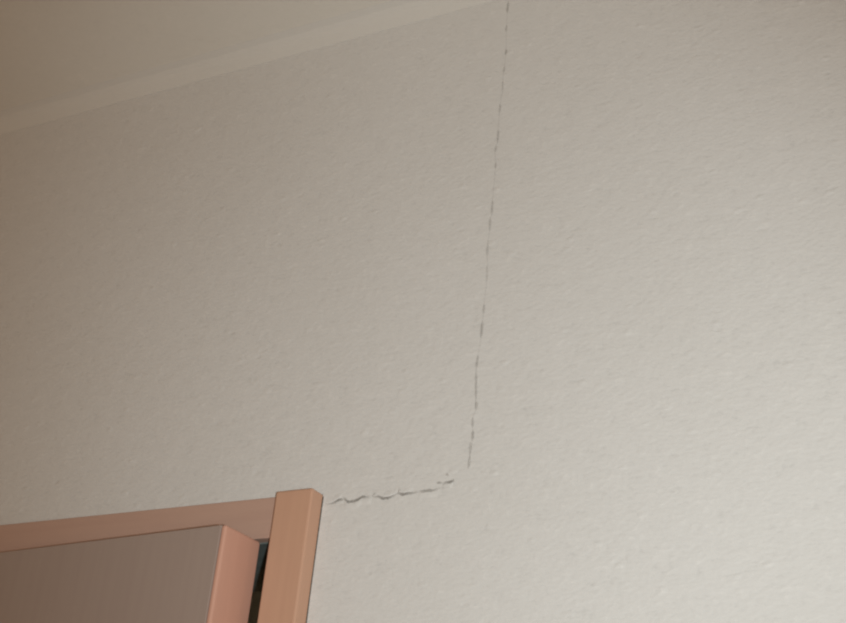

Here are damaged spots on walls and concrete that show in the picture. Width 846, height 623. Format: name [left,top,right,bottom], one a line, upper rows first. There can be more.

crack [326,481,453,510]